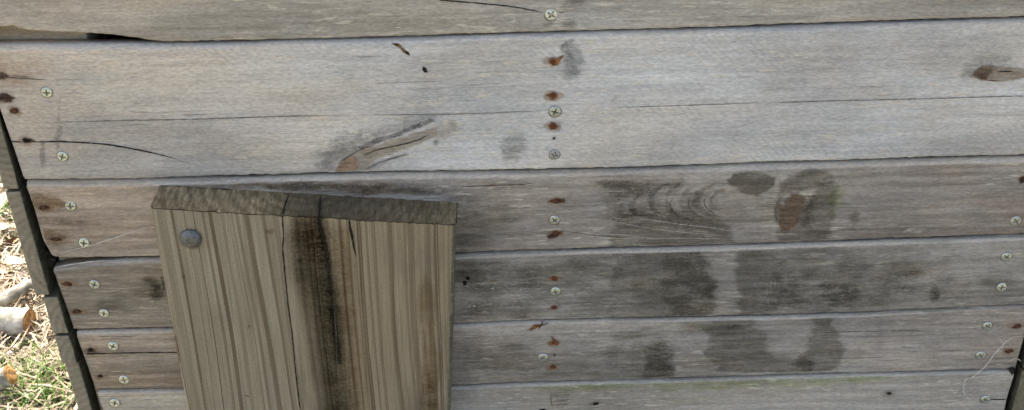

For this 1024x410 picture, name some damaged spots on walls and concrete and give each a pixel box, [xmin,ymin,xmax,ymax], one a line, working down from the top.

crack [281,194,300,407]
water stain [293,221,344,410]